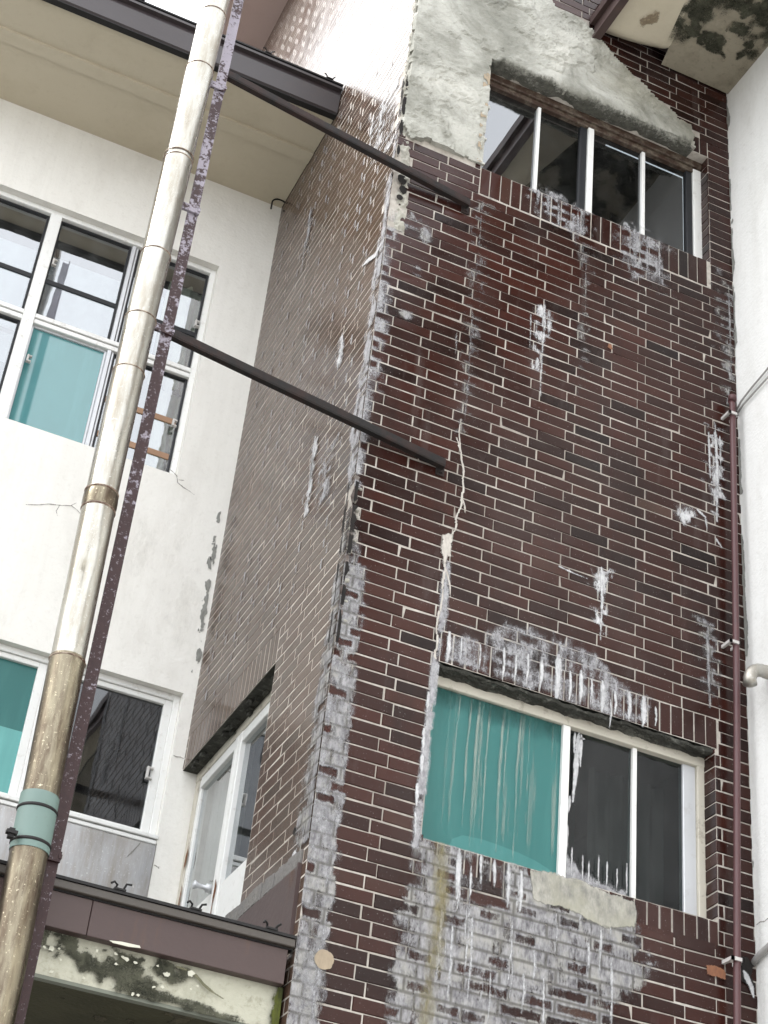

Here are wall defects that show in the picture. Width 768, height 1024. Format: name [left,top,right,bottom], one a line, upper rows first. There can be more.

mould [671,0,768,60]
spalling [391,0,696,233]
efflorescence [528,189,591,265]
efflorescence [621,222,670,285]
efflorescence [530,305,551,393]
efflorescence [677,422,726,527]
peeling [198,536,217,633]
crack [433,421,466,659]
efflorescence [559,566,611,638]
efflorescence [695,615,721,708]
damp [385,626,657,1024]
mould [132,985,244,1023]